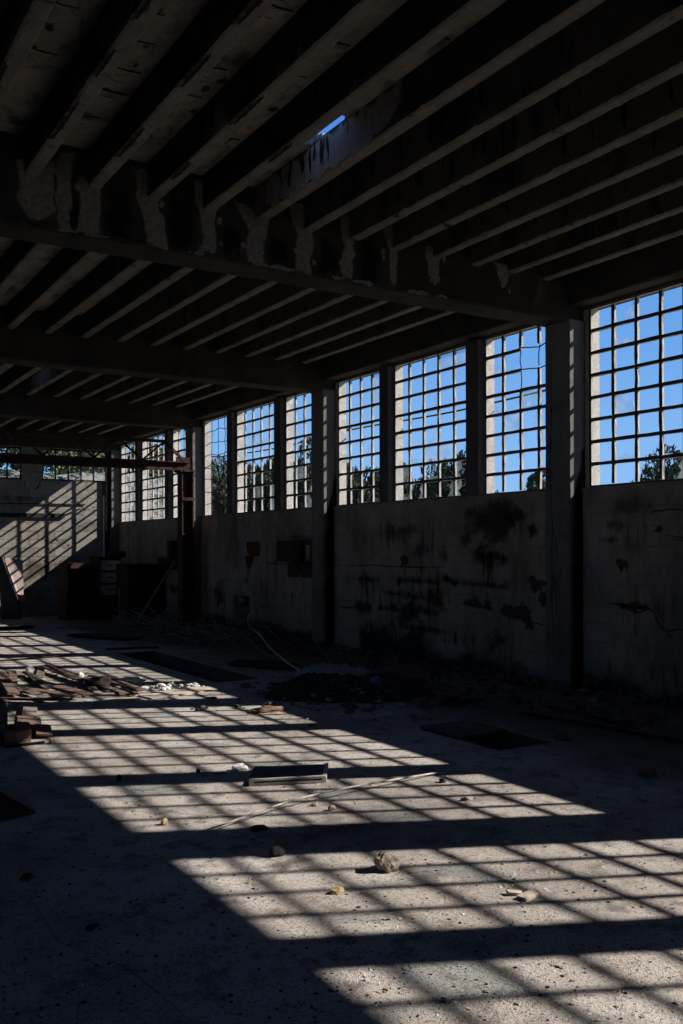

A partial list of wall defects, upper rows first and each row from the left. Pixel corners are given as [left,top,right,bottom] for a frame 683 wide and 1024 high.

peeling [8,152,169,250]
peeling [187,179,233,261]
water stain [279,134,329,195]
peeling [234,79,403,287]
water stain [325,475,544,689]